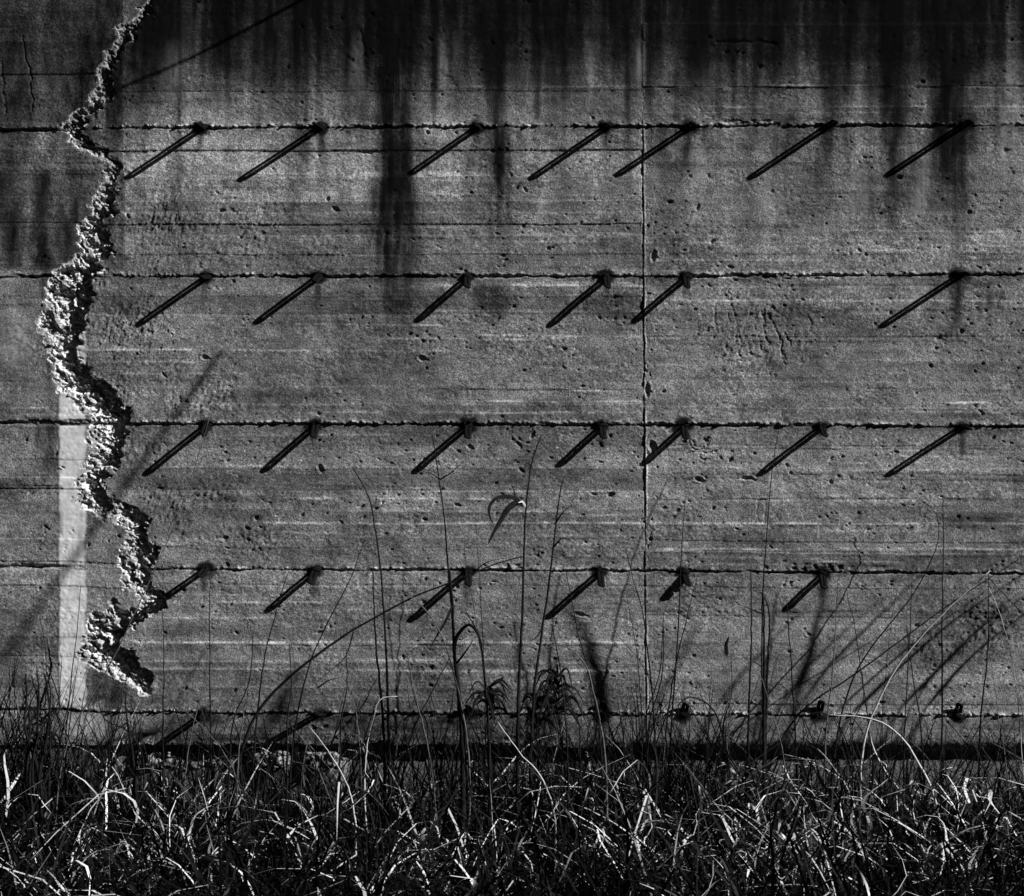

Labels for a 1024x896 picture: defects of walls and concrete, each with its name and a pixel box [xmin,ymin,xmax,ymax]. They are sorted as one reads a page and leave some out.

leakage [94,0,1024,299]
leakage [0,168,86,277]
spalling [75,597,155,697]